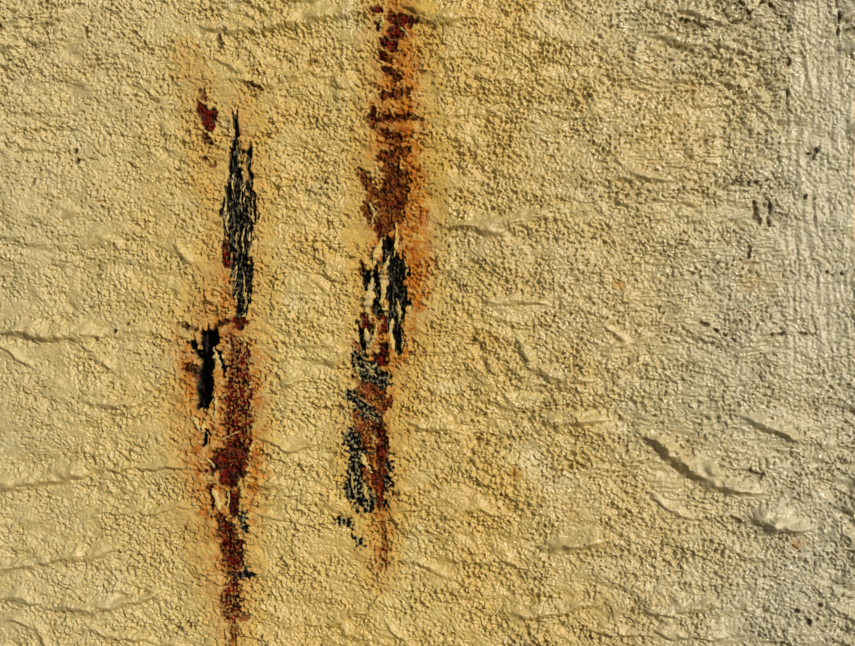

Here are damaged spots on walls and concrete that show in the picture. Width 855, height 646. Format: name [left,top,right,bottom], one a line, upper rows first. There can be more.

spalling [187,326,228,447]
rust [153,29,286,646]
spalling [218,109,260,332]
spalling [331,423,395,551]
spalling [342,222,411,423]
rust [322,0,457,598]